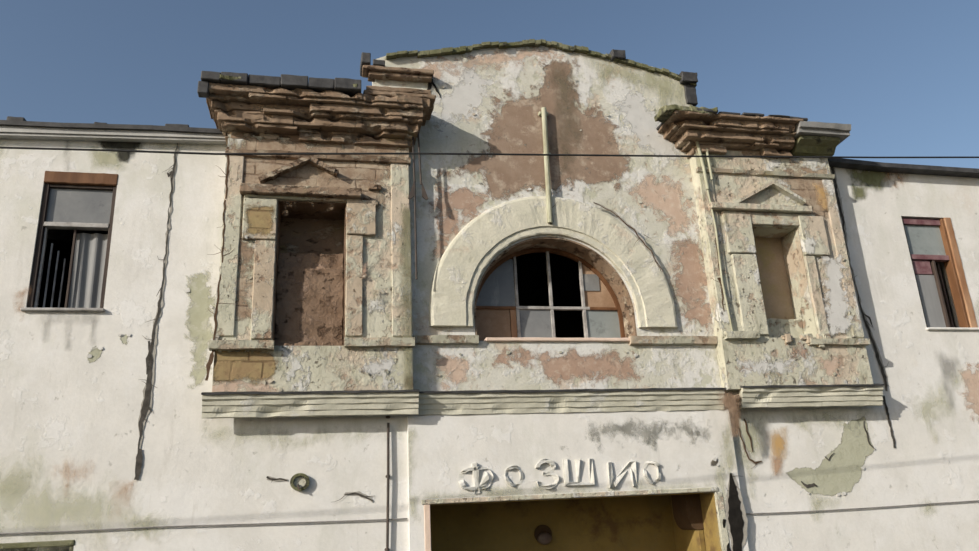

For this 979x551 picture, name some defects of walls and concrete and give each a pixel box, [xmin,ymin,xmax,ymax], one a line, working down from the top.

crack [134,143,179,480]
crack [205,147,235,381]
peeling [184,272,282,392]
peeling [436,352,469,389]
peeling [493,346,640,384]
peeling [423,47,712,331]
crack [593,202,663,272]
crack [830,167,896,448]
peeling [961,364,979,420]
crack [723,409,763,551]
spalling [787,417,875,496]